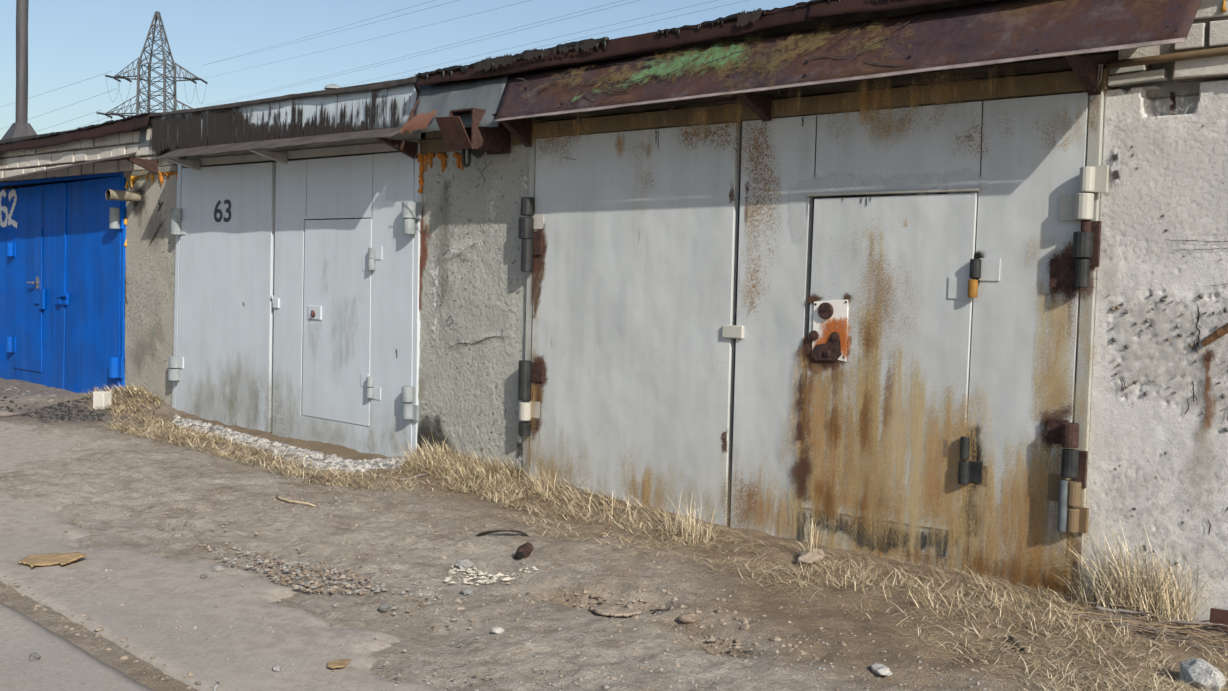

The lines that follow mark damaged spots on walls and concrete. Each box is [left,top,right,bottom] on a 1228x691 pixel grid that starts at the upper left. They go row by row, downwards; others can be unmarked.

corrosion [680,102,780,227]
corrosion [531,224,547,318]
corrosion [530,355,548,440]
corrosion [725,234,1095,597]
corrosion [1198,348,1216,442]
corrosion [628,469,689,509]